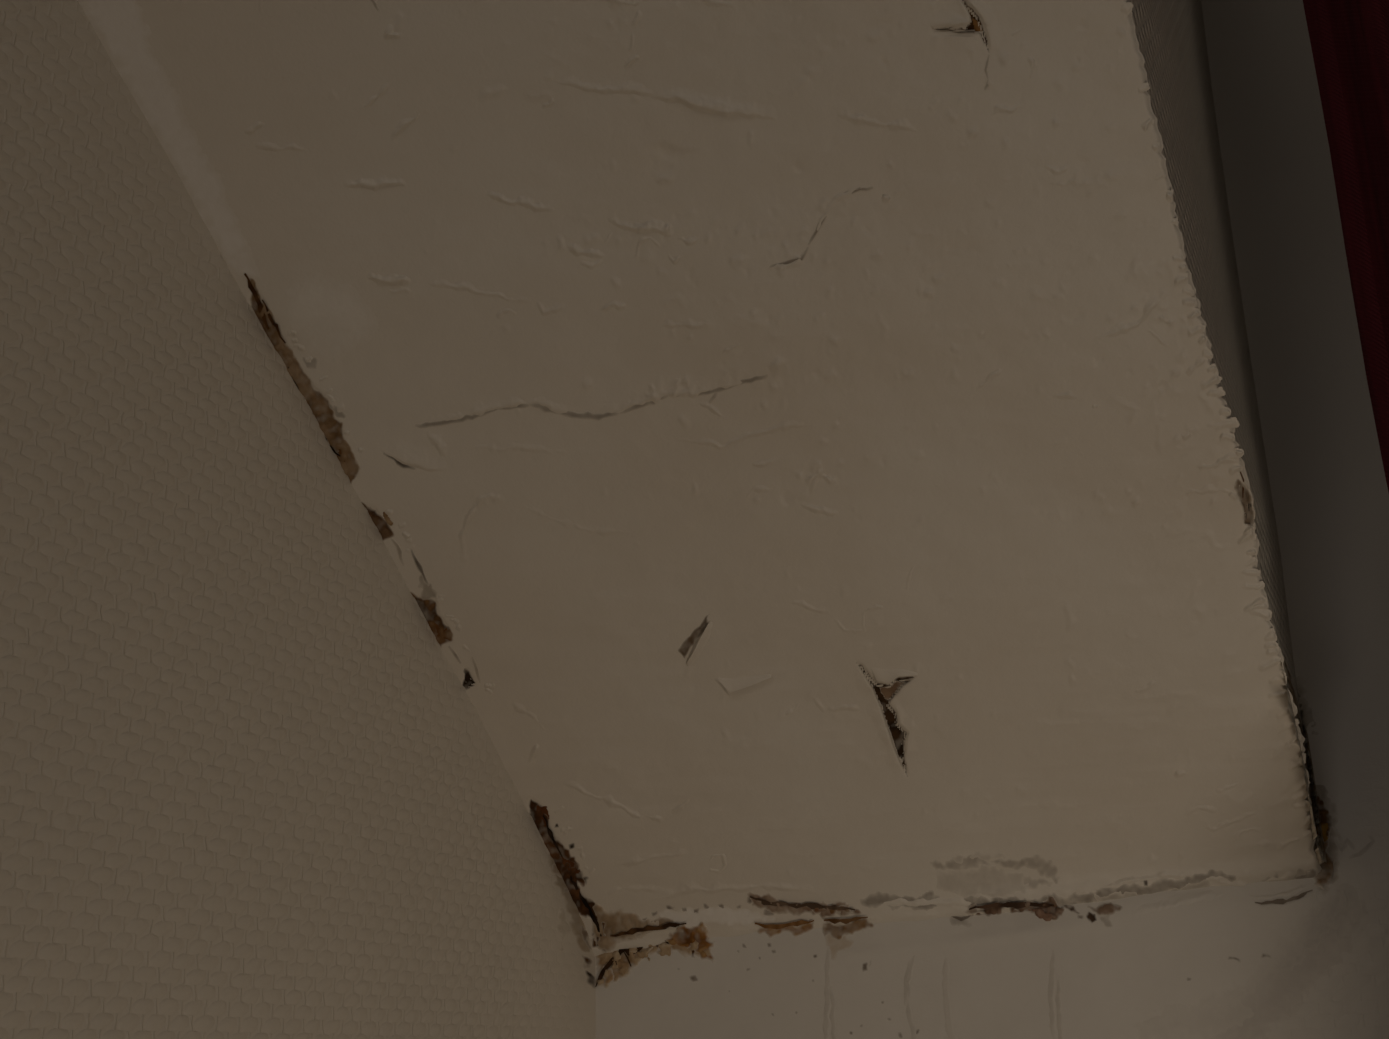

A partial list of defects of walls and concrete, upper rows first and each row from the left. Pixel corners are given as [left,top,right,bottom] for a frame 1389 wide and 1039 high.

flaking render [678,614,713,667]
spalling [590,880,874,989]
spalling [949,896,1123,928]